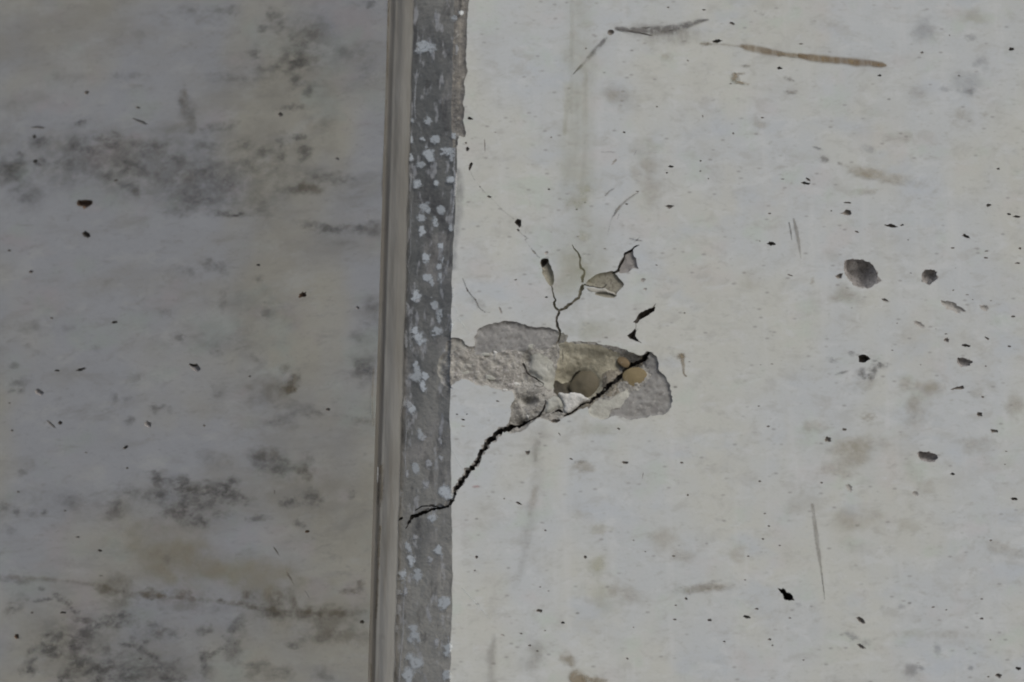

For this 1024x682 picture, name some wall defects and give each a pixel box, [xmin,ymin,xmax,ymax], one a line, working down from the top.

rust [742,45,886,67]
crack [540,245,639,363]
spalling [835,259,882,289]
crack [399,304,656,529]
spalling [437,307,673,434]